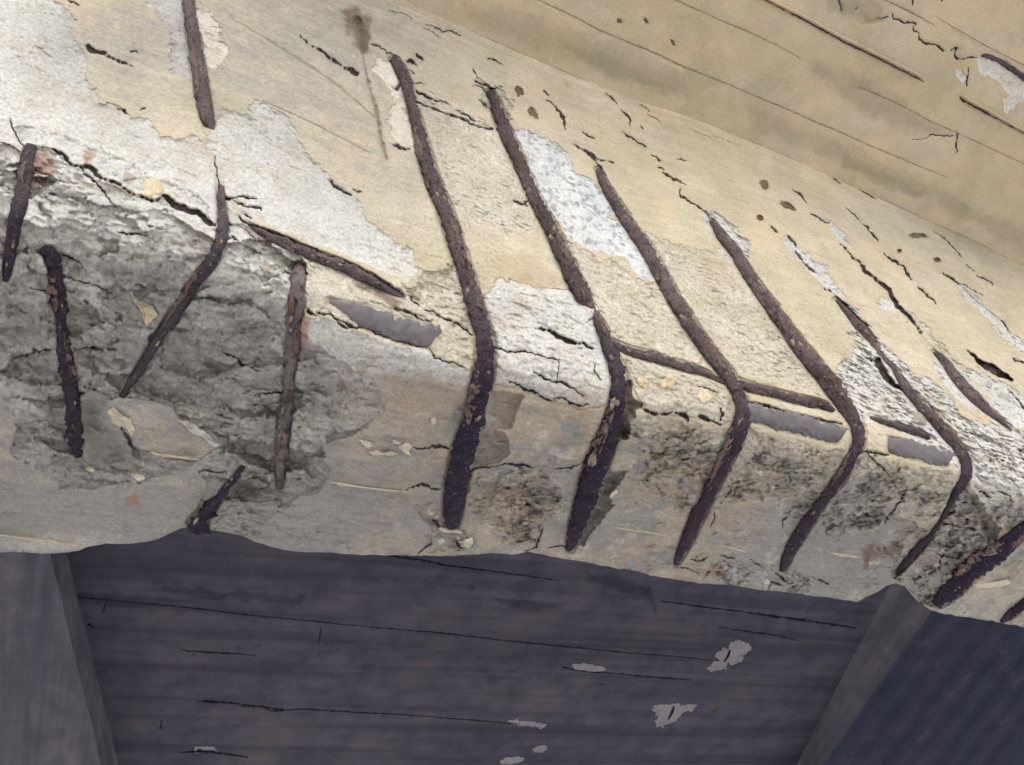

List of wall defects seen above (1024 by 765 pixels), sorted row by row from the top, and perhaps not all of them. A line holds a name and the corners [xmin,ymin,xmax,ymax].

water stain [344,9,370,53]
crack [605,93,713,220]
crack [0,118,473,335]
spalling [0,0,477,536]
spalling [371,57,826,398]
crack [771,226,872,327]
crack [792,179,993,334]
crack [640,367,725,425]
spalling [576,236,1024,606]
crack [866,357,902,391]
crack [967,351,1024,409]
spalling [414,462,568,553]